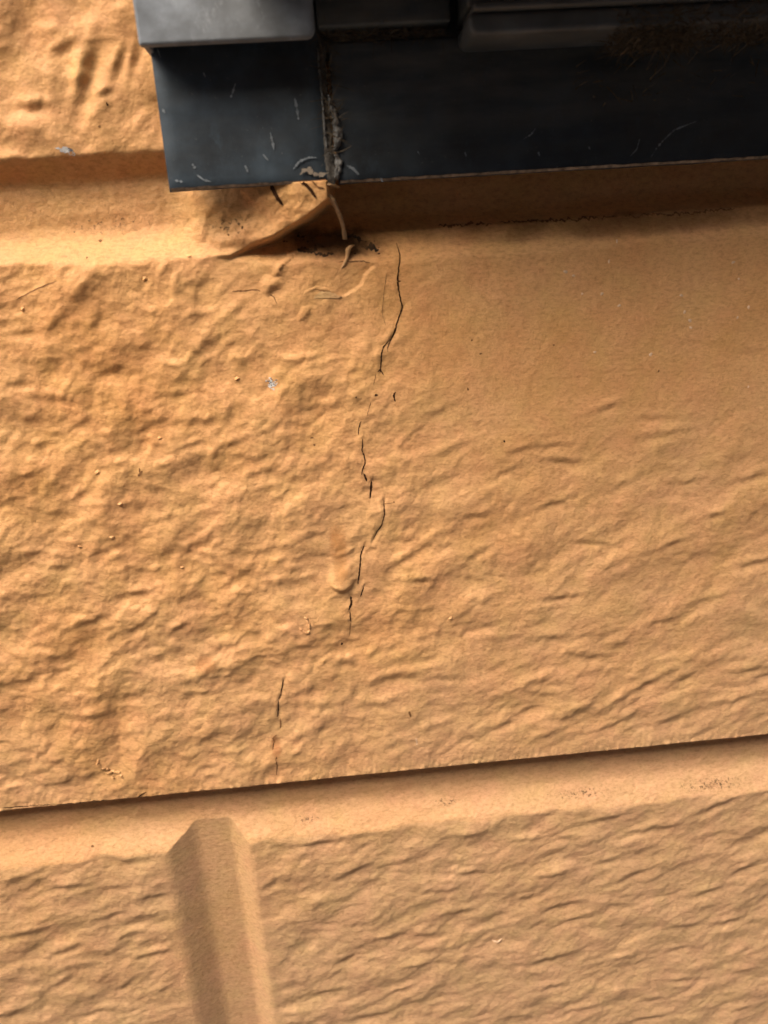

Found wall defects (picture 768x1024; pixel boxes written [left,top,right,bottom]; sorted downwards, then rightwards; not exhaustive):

peeling [270,247,299,277]
crack [347,243,403,636]
crack [271,680,284,775]